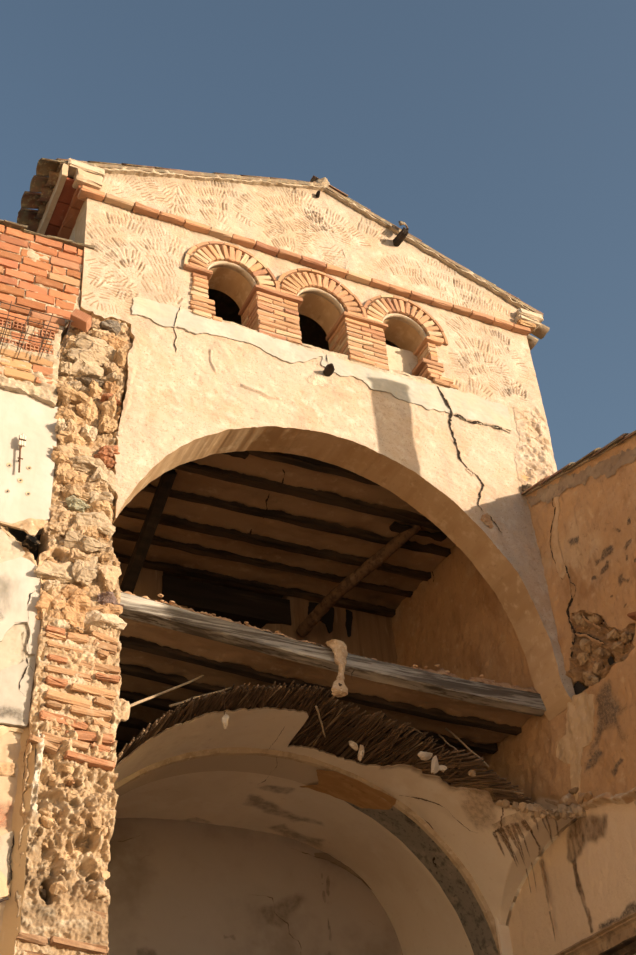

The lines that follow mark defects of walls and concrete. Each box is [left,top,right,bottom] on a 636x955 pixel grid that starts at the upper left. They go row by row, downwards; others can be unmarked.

spalling [0,301,74,359]
crack [436,385,511,532]
peeling [0,518,48,567]
peeling [0,624,33,671]
flaking render [0,724,25,738]
water stain [494,811,636,938]